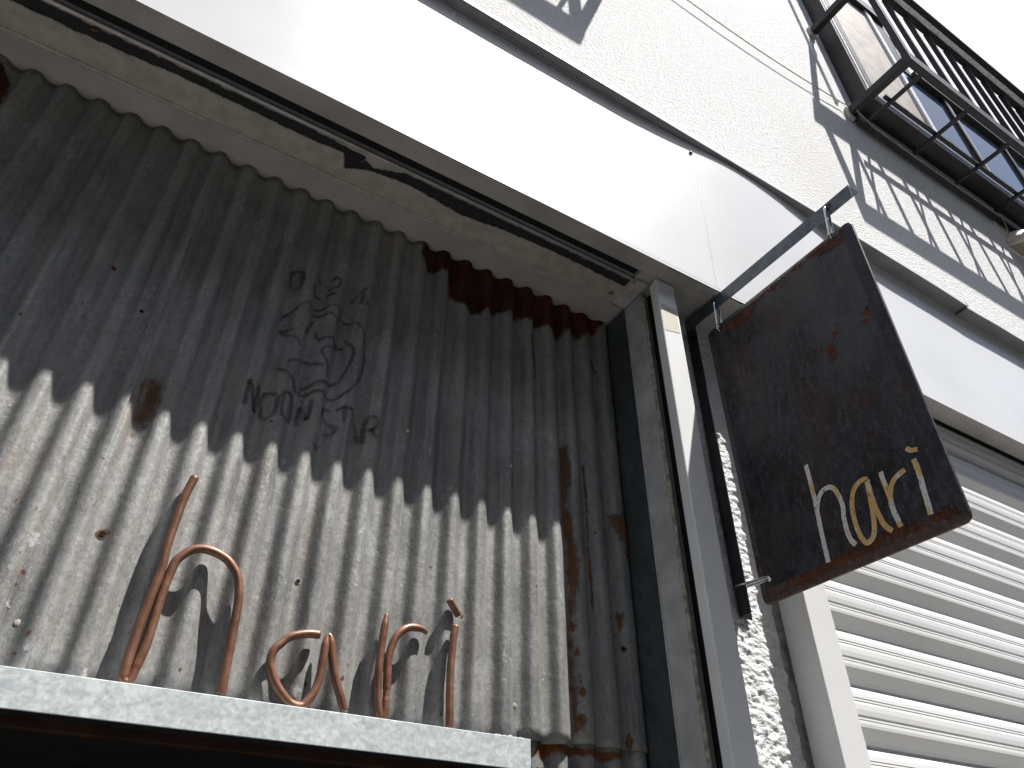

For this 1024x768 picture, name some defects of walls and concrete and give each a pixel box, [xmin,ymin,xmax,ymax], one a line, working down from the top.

corrosion [422,242,602,377]
corrosion [136,380,161,424]
corrosion [560,445,596,731]
corrosion [535,734,633,764]